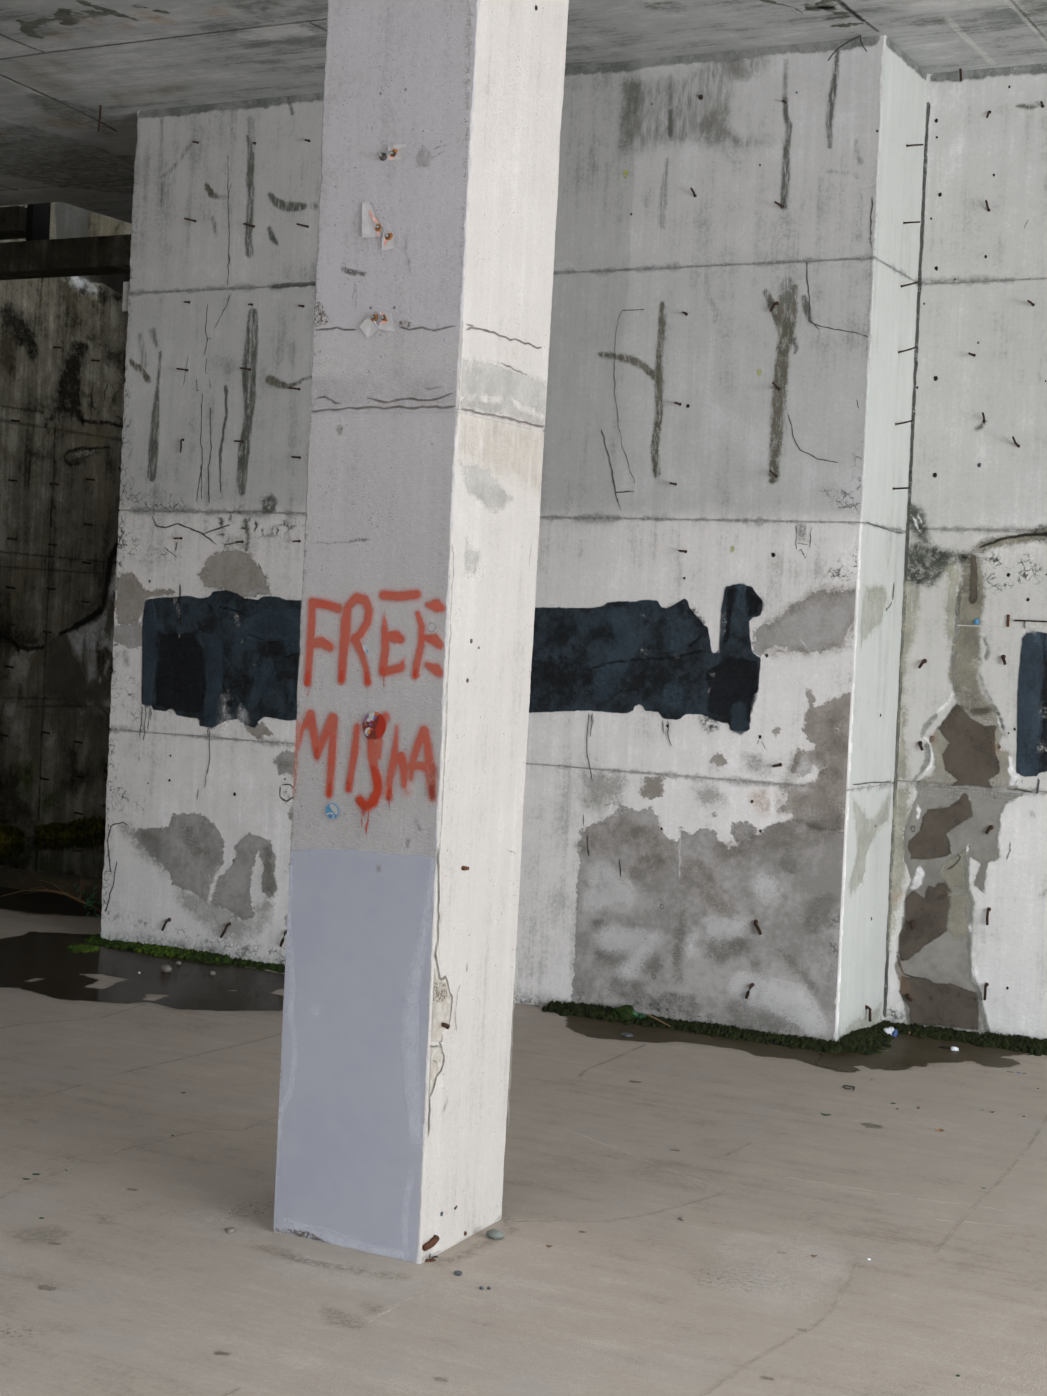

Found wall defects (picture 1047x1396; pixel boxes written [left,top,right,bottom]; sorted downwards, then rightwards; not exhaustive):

crack [315,302,356,331]
crack [399,321,541,424]
crack [0,540,118,654]
water stain [0,491,177,730]
flaking render [106,808,277,938]
spalling [429,970,451,1094]